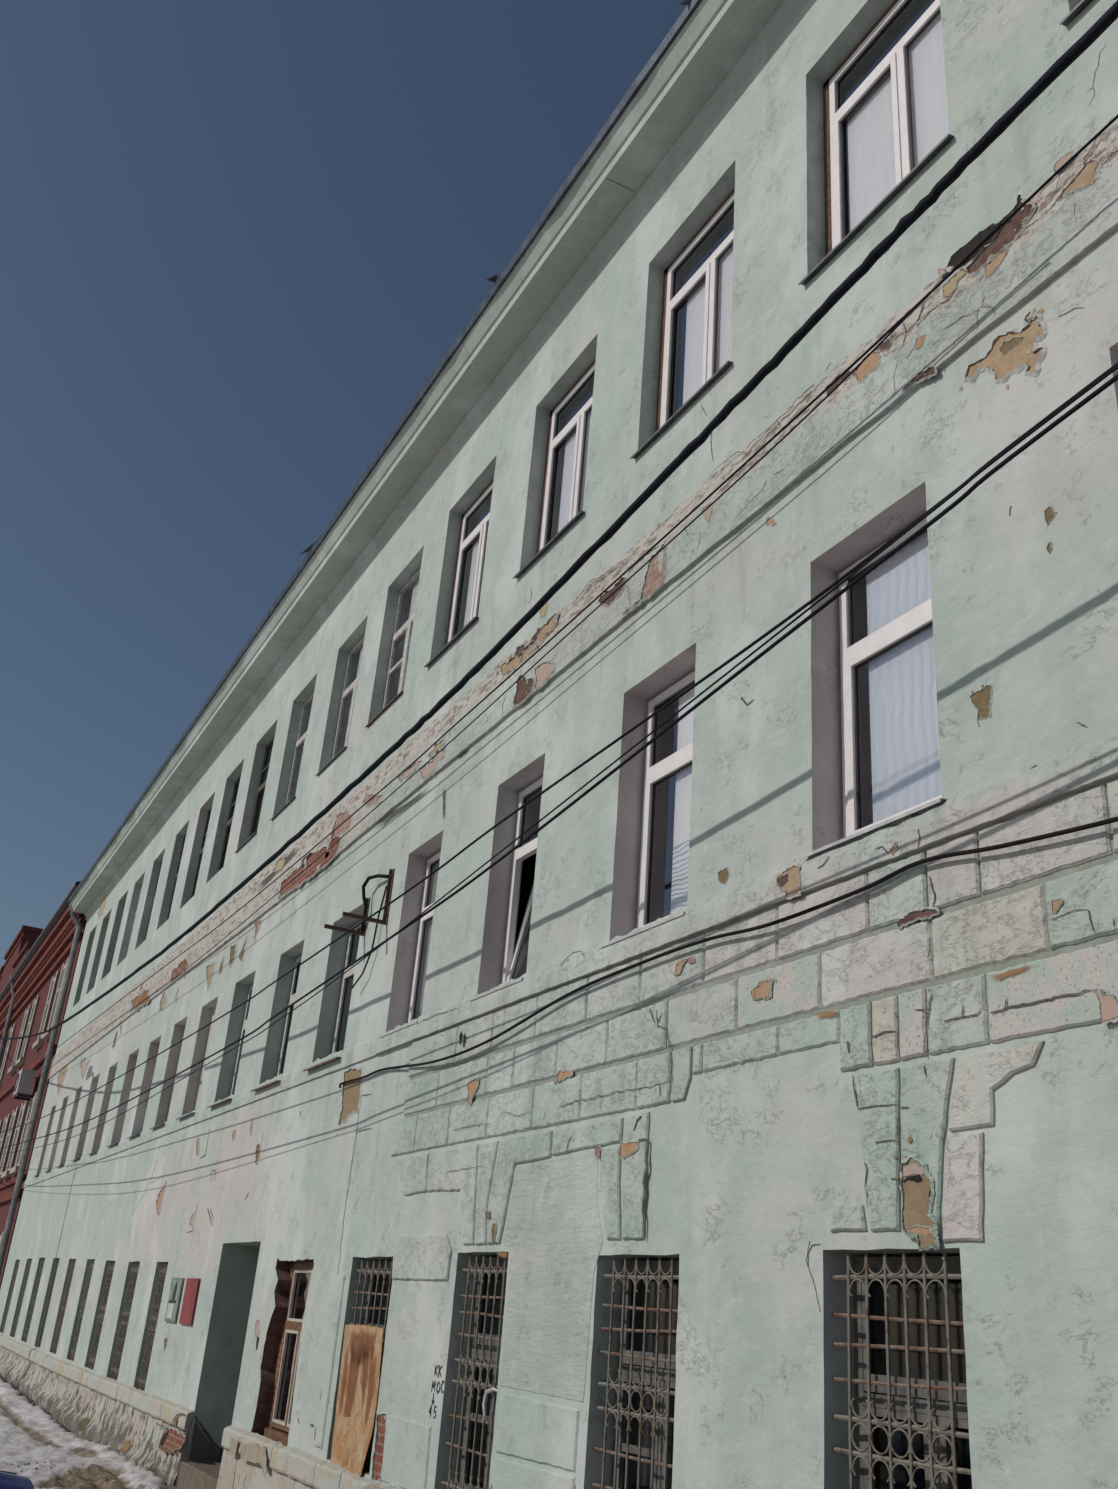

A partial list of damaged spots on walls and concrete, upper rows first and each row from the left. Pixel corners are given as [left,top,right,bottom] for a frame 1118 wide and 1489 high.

peeling [959,308,1047,390]
flaking render [598,542,668,615]
flaking render [496,602,559,707]
peeling [969,684,993,726]
flaking render [273,792,383,899]
peeling [776,860,802,900]
crack [876,829,936,958]
flaking render [897,904,940,929]
peeling [751,977,776,1003]
peeling [336,1066,364,1136]
crack [847,990,1091,1205]
peeling [893,1136,944,1260]